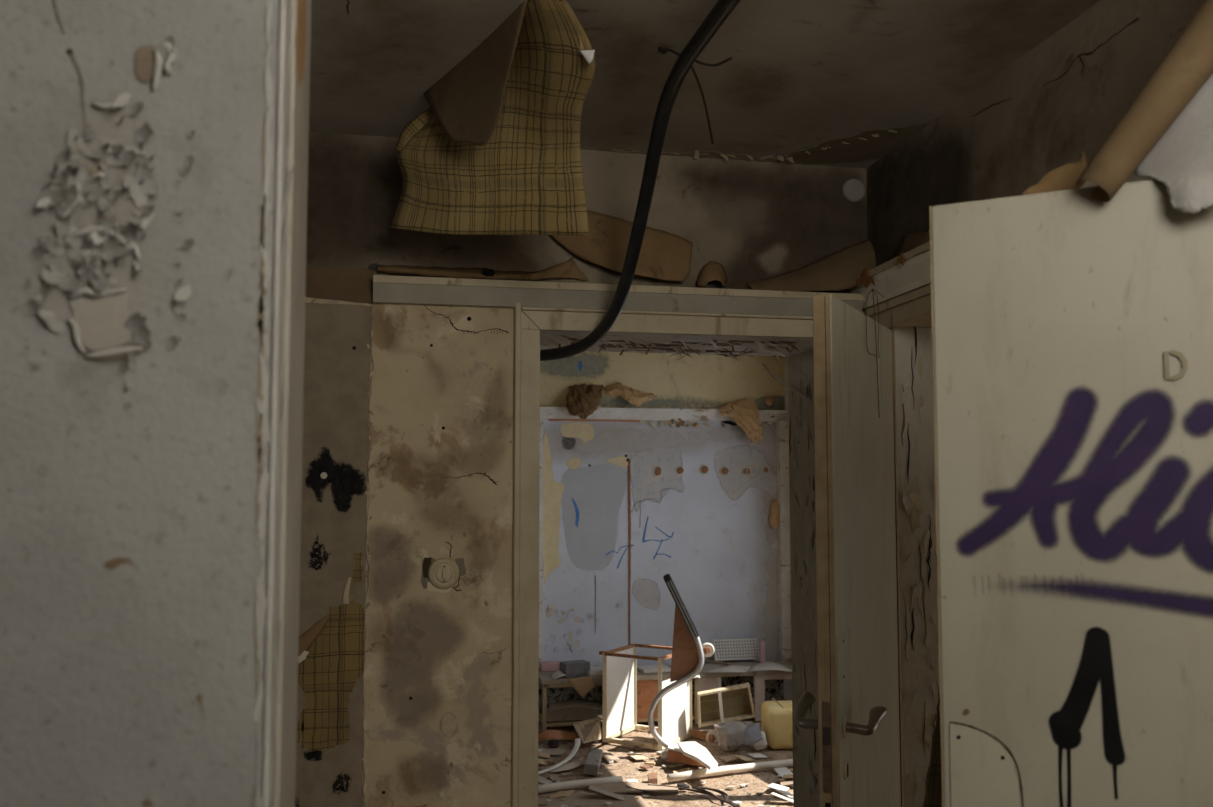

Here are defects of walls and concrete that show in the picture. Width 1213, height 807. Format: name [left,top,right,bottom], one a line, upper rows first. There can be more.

peeling [135,35,177,90]
peeling [21,93,195,412]
crack [424,305,509,334]
peeling [638,417,736,429]
peeling [755,396,813,455]
peeling [543,422,770,584]